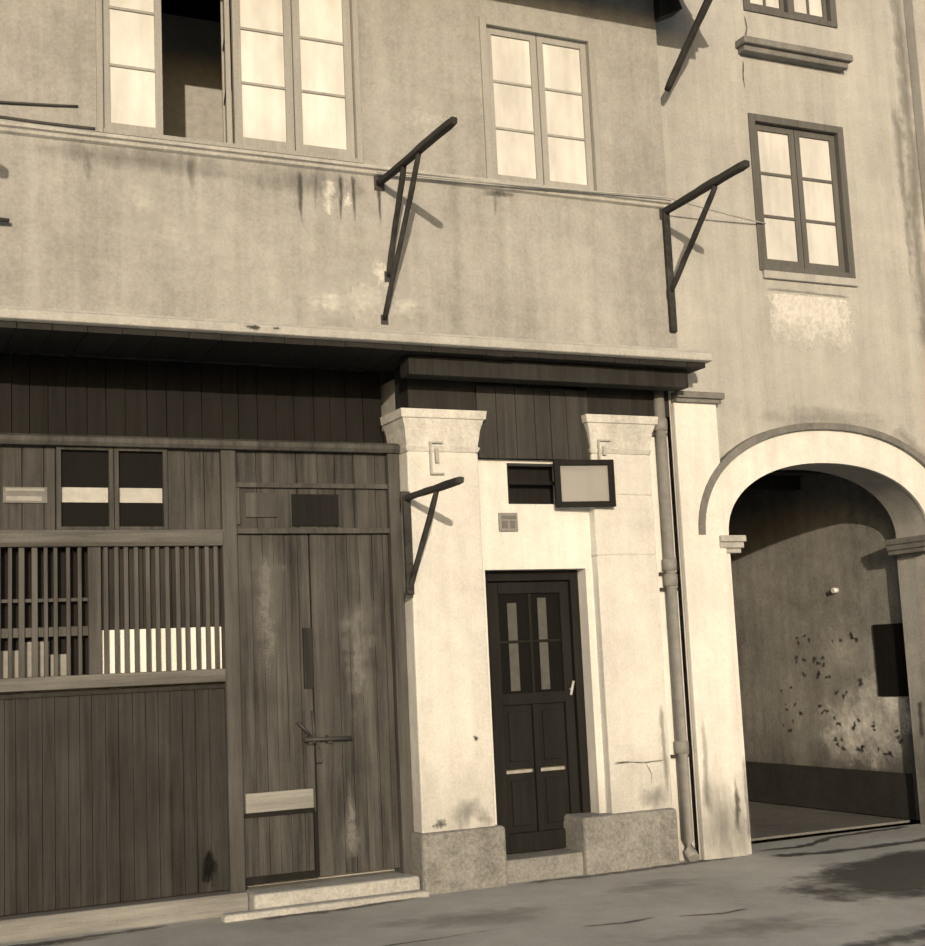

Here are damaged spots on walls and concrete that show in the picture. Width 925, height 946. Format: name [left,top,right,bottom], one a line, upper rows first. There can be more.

damp [339,178,355,211]